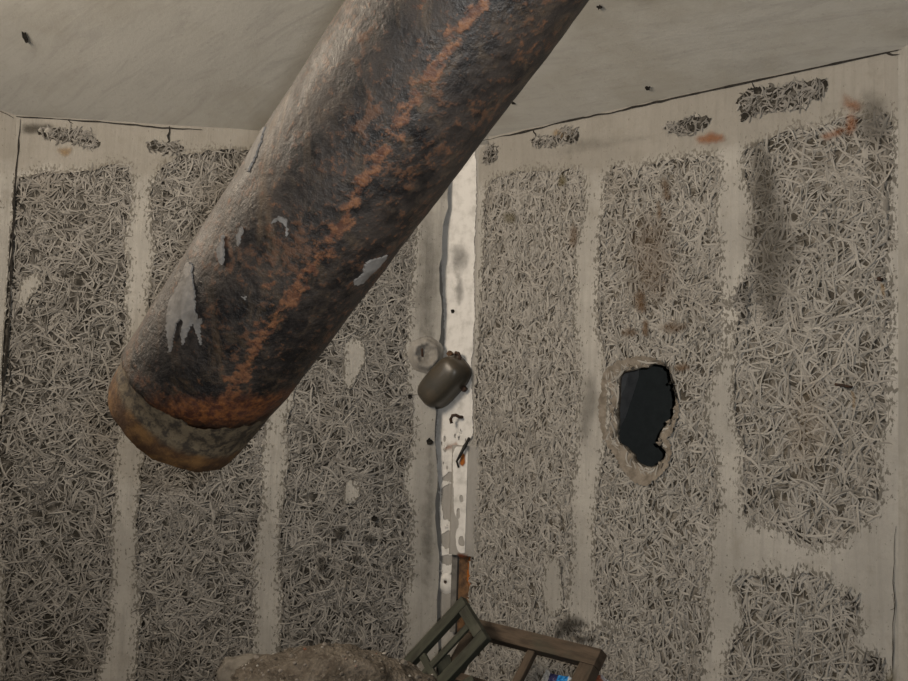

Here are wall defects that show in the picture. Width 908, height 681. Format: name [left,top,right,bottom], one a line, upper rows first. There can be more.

flaking render [735,76,828,122]
flaking render [662,113,711,137]
spalling [597,356,680,486]